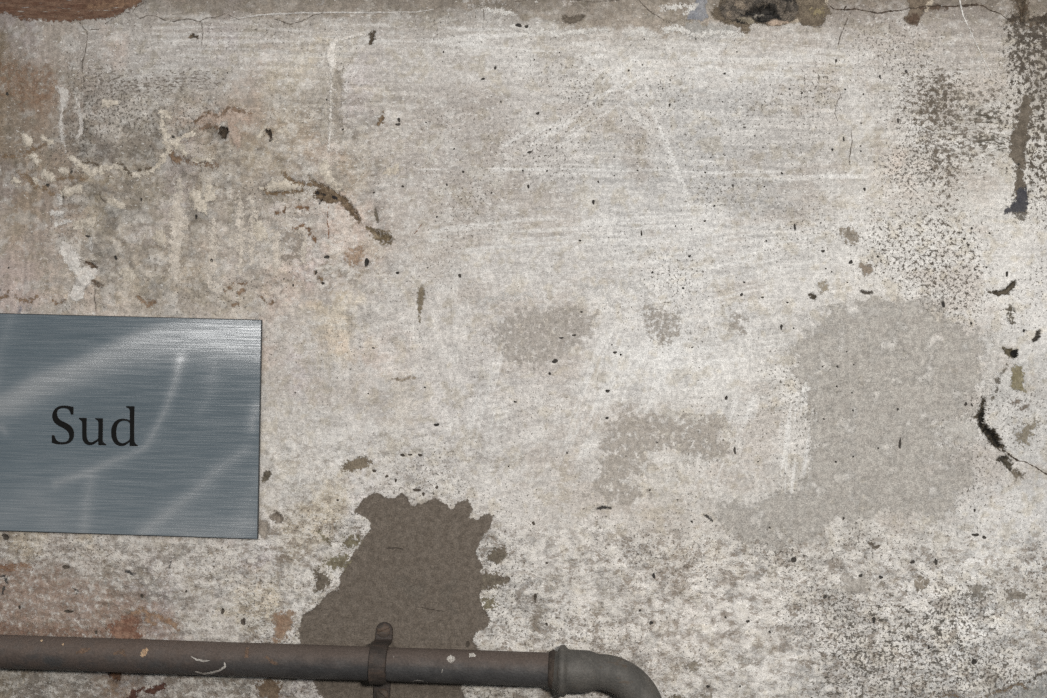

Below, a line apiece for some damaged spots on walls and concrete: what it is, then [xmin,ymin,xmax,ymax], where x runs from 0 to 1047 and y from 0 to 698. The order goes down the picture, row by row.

peeling [463,0,608,39]
spalling [622,0,832,40]
water stain [858,11,1047,319]
crack [973,334,1047,479]